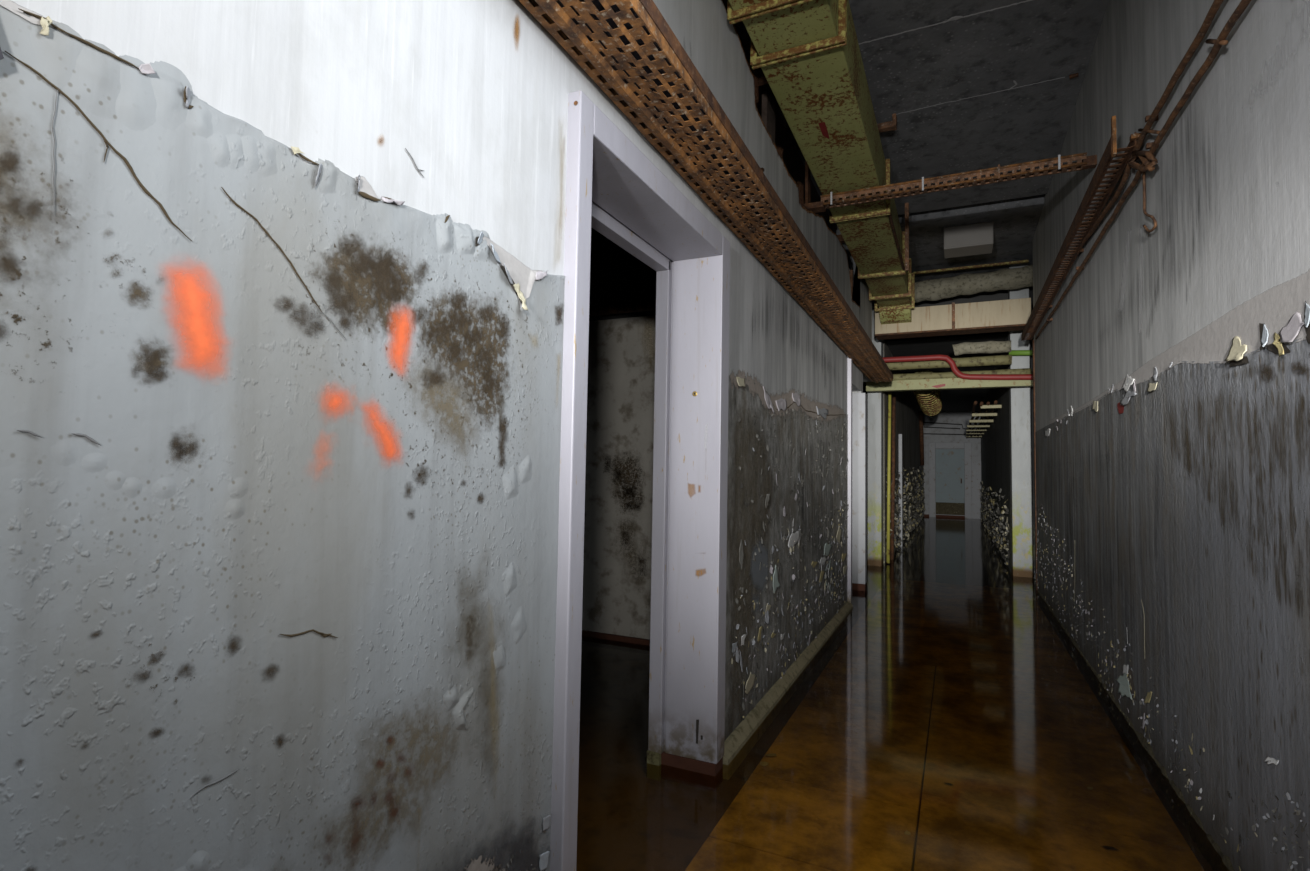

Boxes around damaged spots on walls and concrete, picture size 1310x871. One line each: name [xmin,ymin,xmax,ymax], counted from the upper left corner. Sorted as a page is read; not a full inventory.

damp [0,154,39,297]
crack [5,51,192,241]
damp [0,307,53,363]
damp [283,234,535,501]
peeling [1045,269,1310,437]
damp [605,453,645,575]
peeling [730,369,849,720]
peeling [1034,509,1310,871]
spalling [464,850,550,871]